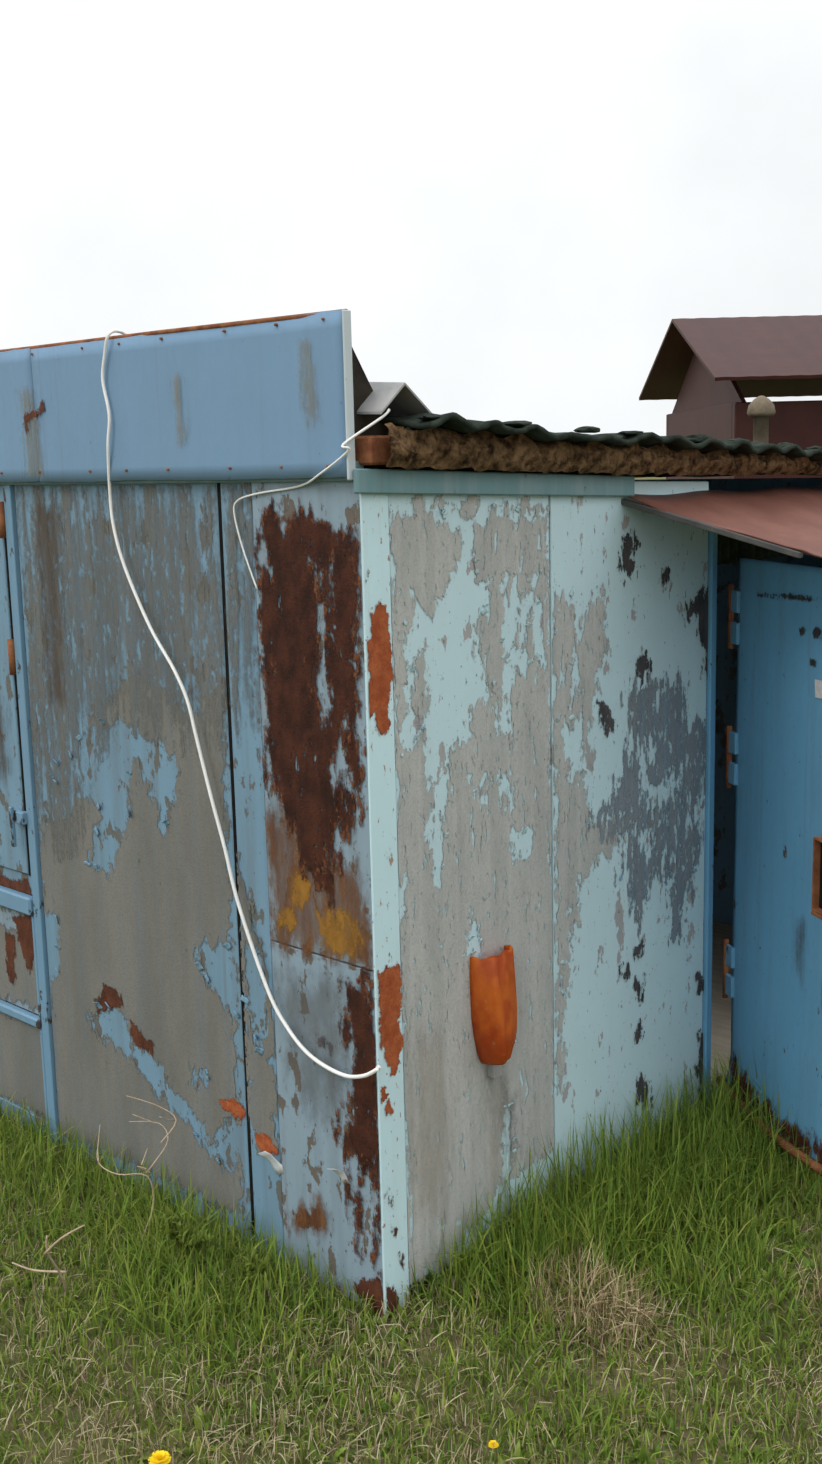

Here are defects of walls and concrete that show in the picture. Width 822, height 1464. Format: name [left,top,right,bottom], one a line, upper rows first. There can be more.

corrosion [0,866,31,895]
corrosion [5,914,34,985]
peeling [0,674,284,1220]
corrosion [253,497,405,1317]
peeling [389,494,708,1290]
corrosion [94,984,153,1057]
corrosion [726,1052,822,1164]